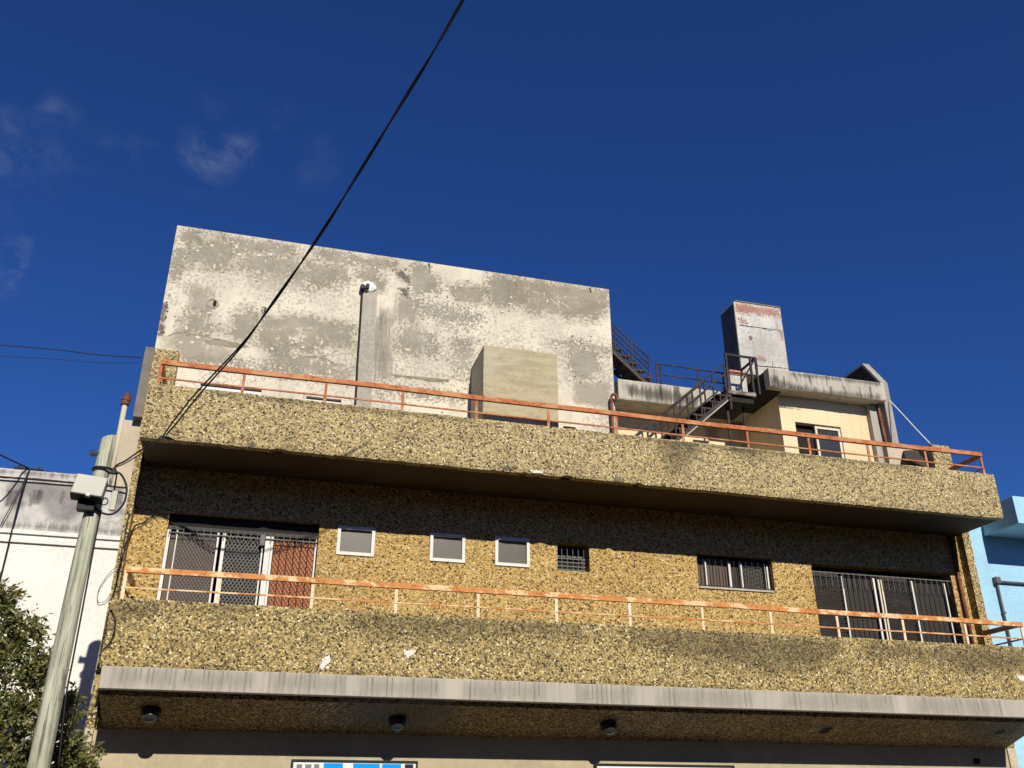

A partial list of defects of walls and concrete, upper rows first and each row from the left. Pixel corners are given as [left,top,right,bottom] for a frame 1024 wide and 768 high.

water stain [374,296,417,379]
water stain [263,343,355,379]
water stain [575,384,609,405]
water stain [630,385,696,406]